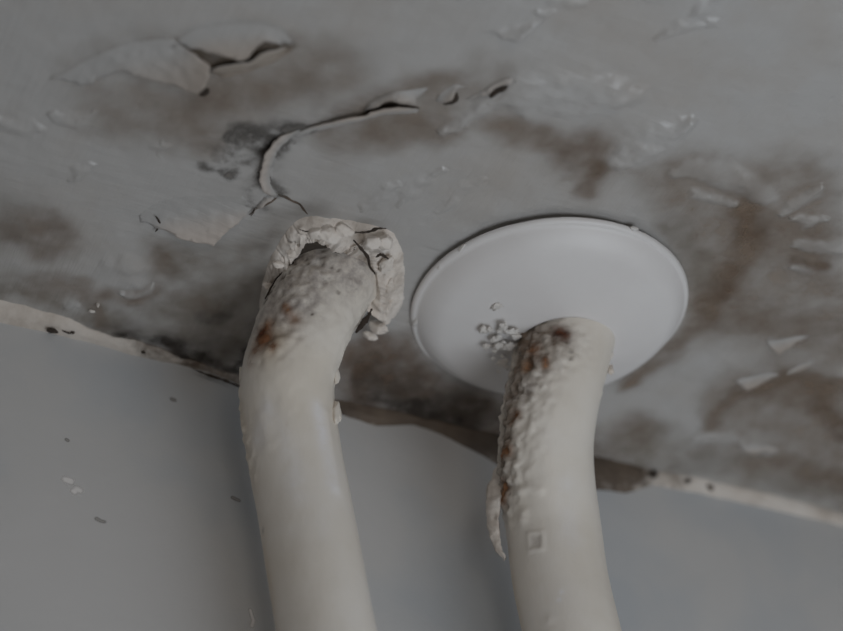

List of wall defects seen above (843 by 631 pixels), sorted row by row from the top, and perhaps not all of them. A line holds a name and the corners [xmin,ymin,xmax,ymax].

peeling [50,19,298,97]
crack [291,77,513,142]
mould [224,124,314,157]
mould [200,164,236,180]
peeling [139,195,274,246]
hole [299,242,327,255]
mould [161,337,207,361]
rust [256,322,276,349]
rust [554,328,569,339]
peeling [765,333,812,355]
peeling [733,360,815,391]
peeling [485,463,506,561]